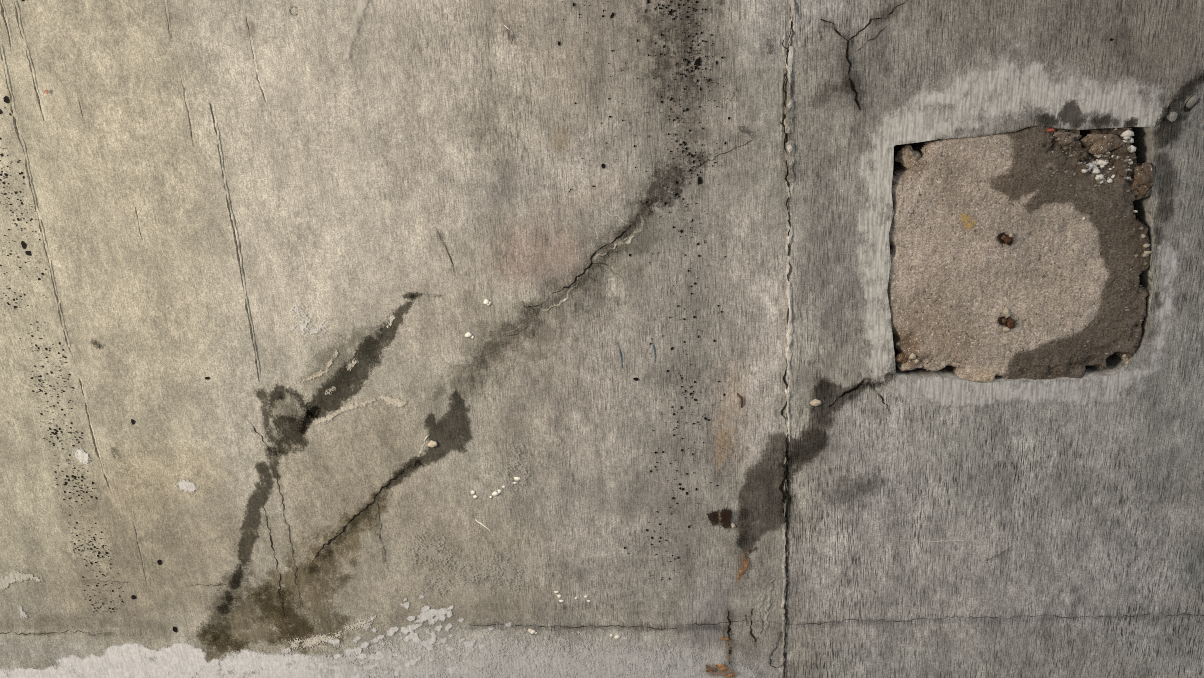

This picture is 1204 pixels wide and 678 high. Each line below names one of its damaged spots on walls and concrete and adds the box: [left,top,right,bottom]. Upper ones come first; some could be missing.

crack [818,0,907,110]
crack [505,211,644,336]
peeling [1019,128,1152,364]
damp [218,292,422,614]
damp [384,391,471,489]
rust [707,508,756,598]